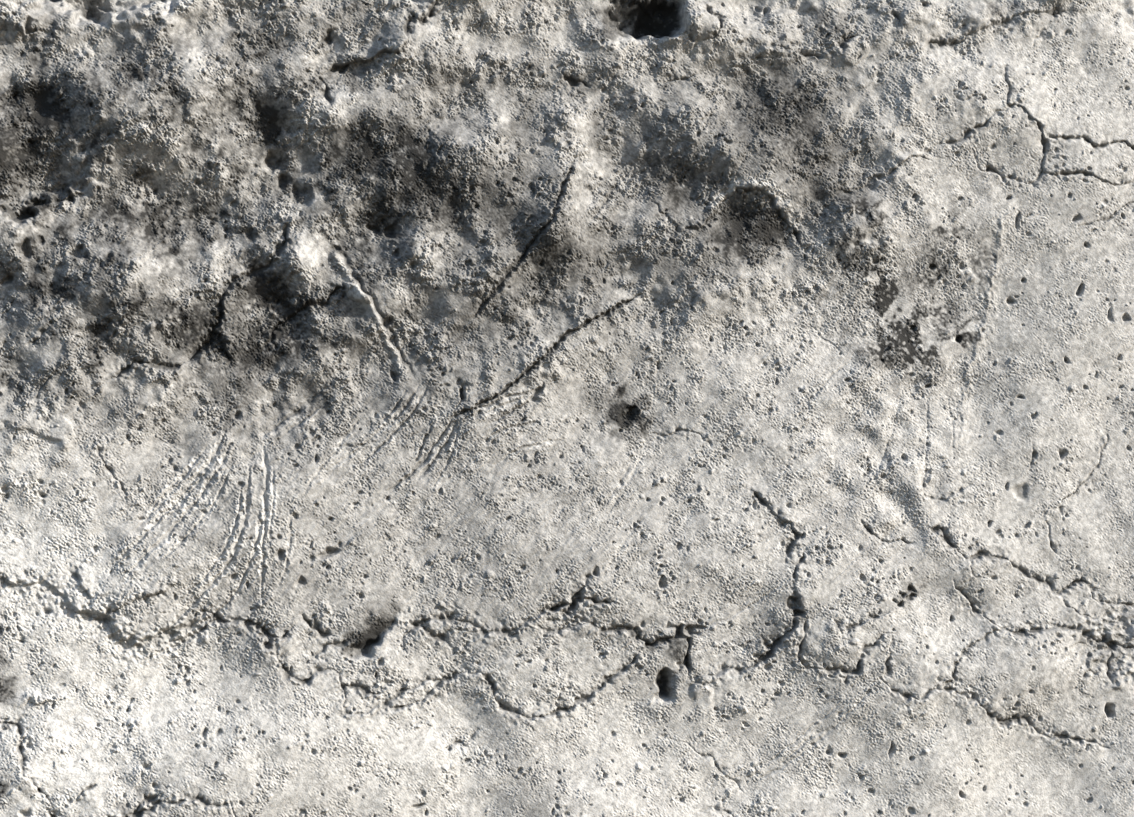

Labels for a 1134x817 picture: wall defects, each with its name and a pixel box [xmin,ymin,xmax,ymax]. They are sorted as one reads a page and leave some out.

crack [309,0,438,108]
crack [837,64,1134,229]
crack [110,223,291,382]
crack [262,283,355,351]
crack [0,563,643,752]
crack [687,427,1134,751]